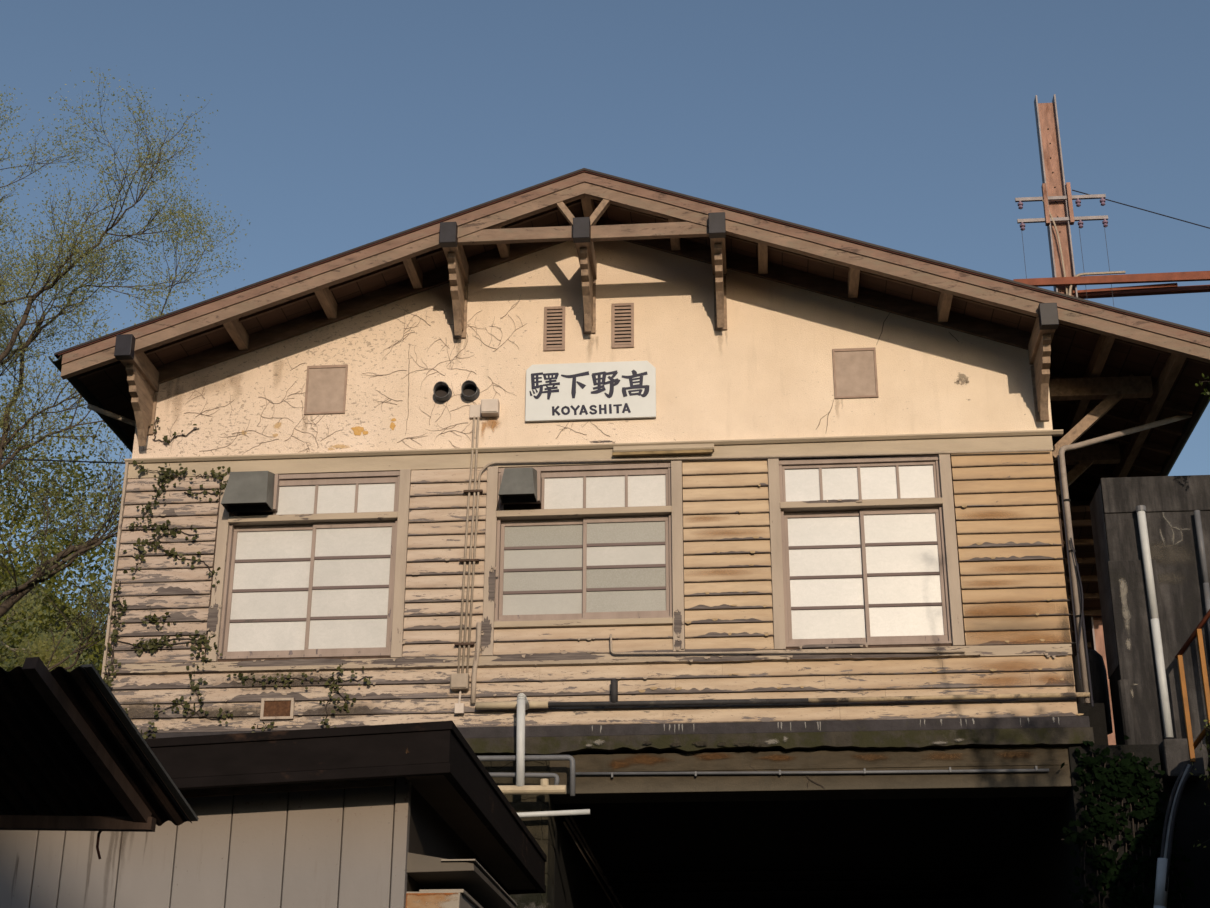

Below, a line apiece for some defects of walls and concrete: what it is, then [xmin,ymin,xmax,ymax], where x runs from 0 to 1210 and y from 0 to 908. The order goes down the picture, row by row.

peeling [133,508,206,530]
peeling [700,536,770,567]
peeling [962,541,1062,561]
peeling [107,586,222,650]
peeling [371,557,619,664]
peeling [480,591,1074,697]
peeling [127,658,450,733]
corrosion [406,893,454,908]